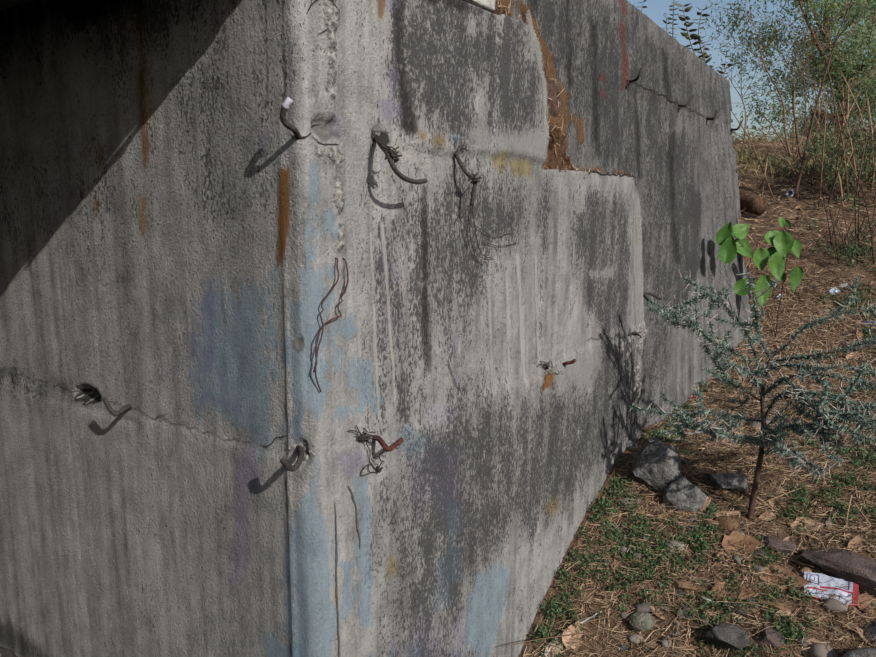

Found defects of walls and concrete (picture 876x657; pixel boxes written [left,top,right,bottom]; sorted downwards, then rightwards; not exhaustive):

crack [307,0,341,35]
rust [136,3,152,167]
rust [278,168,290,265]
damp [506,256,528,387]
crack [0,367,294,459]
rust [542,373,554,391]